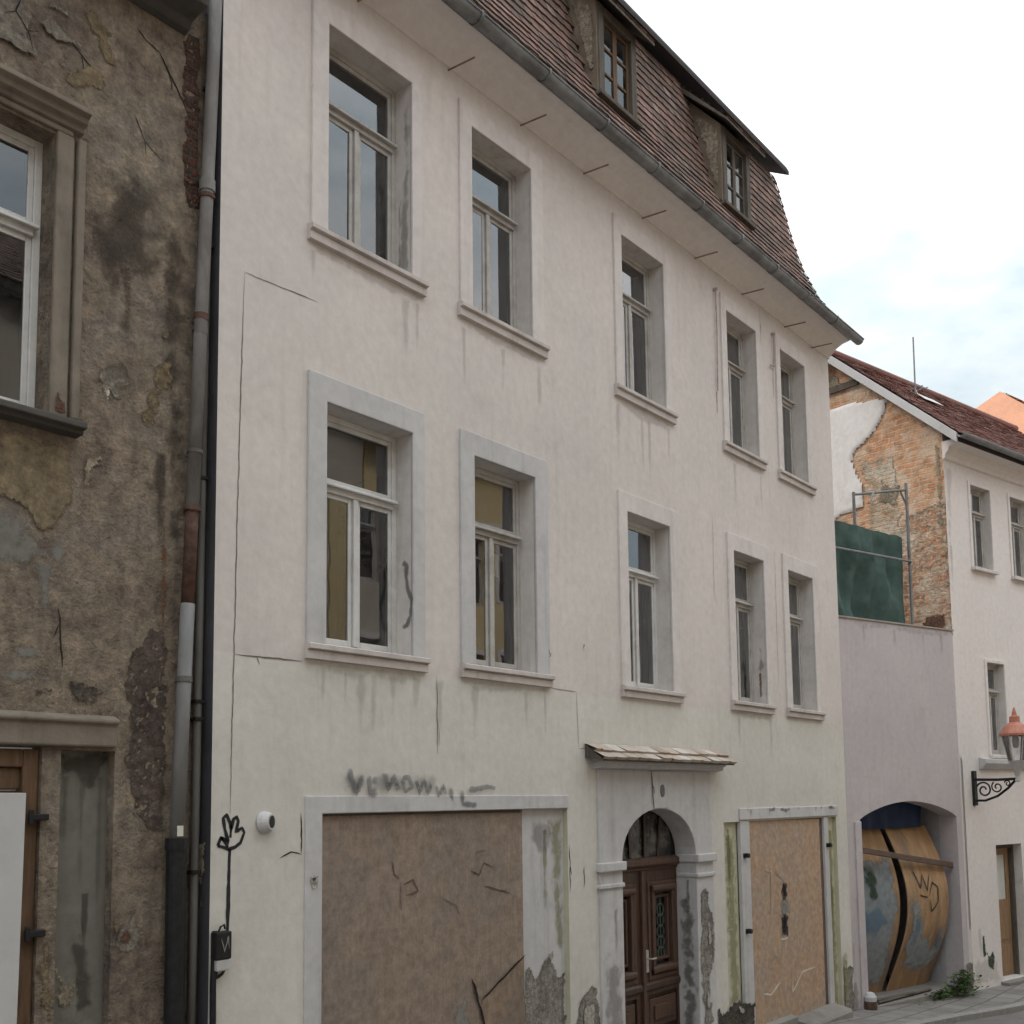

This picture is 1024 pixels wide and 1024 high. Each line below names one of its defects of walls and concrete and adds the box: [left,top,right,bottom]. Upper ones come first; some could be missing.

peeling [0,0,83,64]
crack [137,28,187,111]
spalling [182,34,201,209]
spalling [100,361,174,426]
peeling [0,432,104,530]
water stain [156,456,164,500]
crack [230,272,315,806]
peeling [829,376,953,635]
spalling [124,629,168,833]
crack [281,817,302,858]
spalling [525,951,601,1024]
peeling [701,888,756,1024]